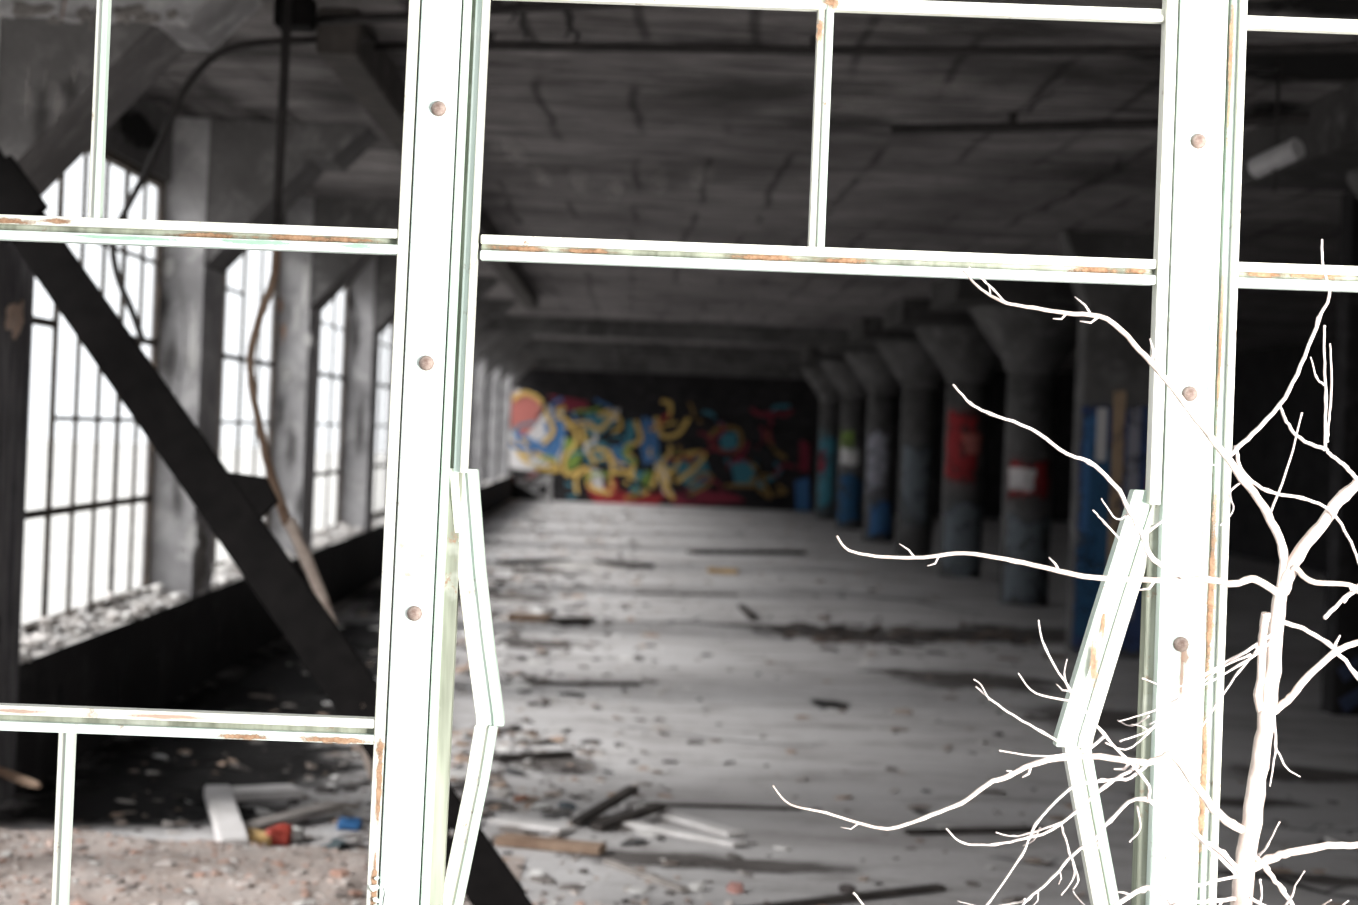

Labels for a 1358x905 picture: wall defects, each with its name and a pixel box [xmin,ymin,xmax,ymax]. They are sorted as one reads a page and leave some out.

crack [563,10,582,52]
corrosion [816,0,839,42]
corrosion [1226,0,1235,147]
corrosion [1217,263,1225,407]
corrosion [1090,613,1106,686]
corrosion [1206,494,1218,681]
corrosion [300,736,385,820]
corrosion [1198,720,1209,853]